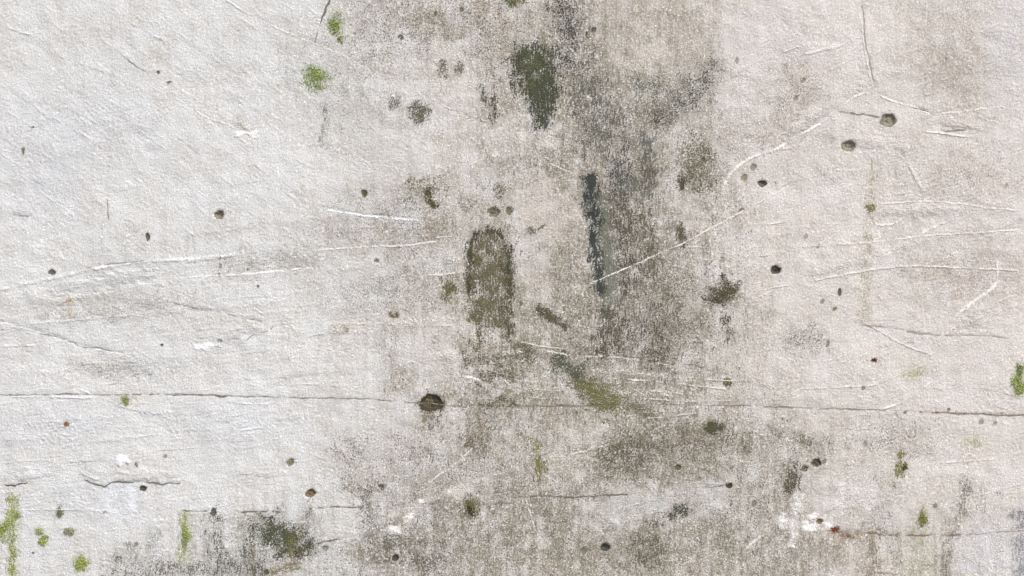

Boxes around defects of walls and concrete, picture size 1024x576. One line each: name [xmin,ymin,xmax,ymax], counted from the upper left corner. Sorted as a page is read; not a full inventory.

crack [79,477,180,487]
leakage [100,498,302,576]
mould [318,224,540,576]
leakage [516,0,962,576]